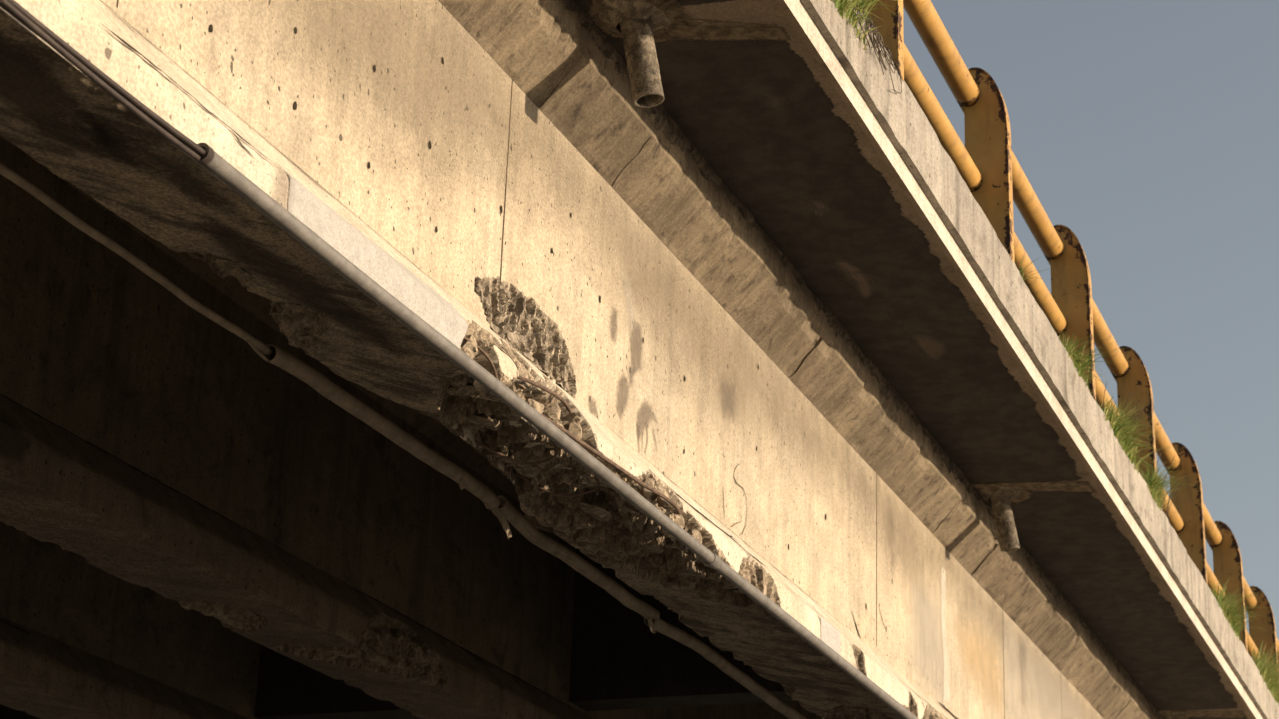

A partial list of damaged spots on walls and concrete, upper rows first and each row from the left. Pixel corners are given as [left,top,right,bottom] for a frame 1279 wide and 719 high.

crack [101,0,445,290]
spalling [266,298,333,355]
leakage [617,324,642,416]
leakage [646,0,1247,719]
spalling [431,277,781,617]
leakage [637,403,656,451]
spalling [852,644,867,676]
spalling [903,691,944,719]